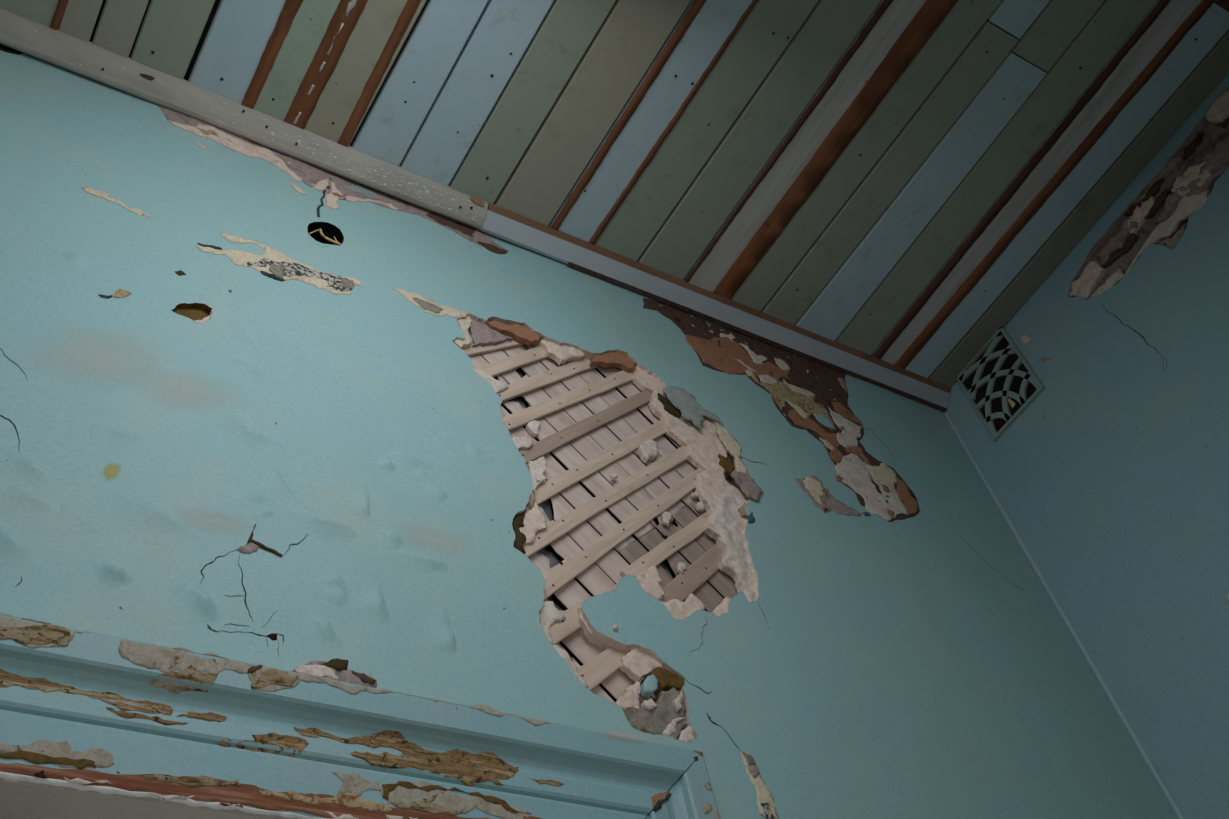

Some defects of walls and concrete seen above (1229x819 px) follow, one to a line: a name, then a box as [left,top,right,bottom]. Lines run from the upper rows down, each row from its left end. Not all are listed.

peeling [196,233,363,295]
peeling [167,120,400,211]
spalling [308,225,342,245]
flaking render [1068,87,1229,300]
spalling [174,308,209,321]
peeling [643,298,920,522]
flaking render [392,287,764,761]
peeling [0,613,84,648]
crack [200,524,308,658]
peeling [0,639,557,726]
peeling [0,740,114,784]
peeling [216,727,531,819]